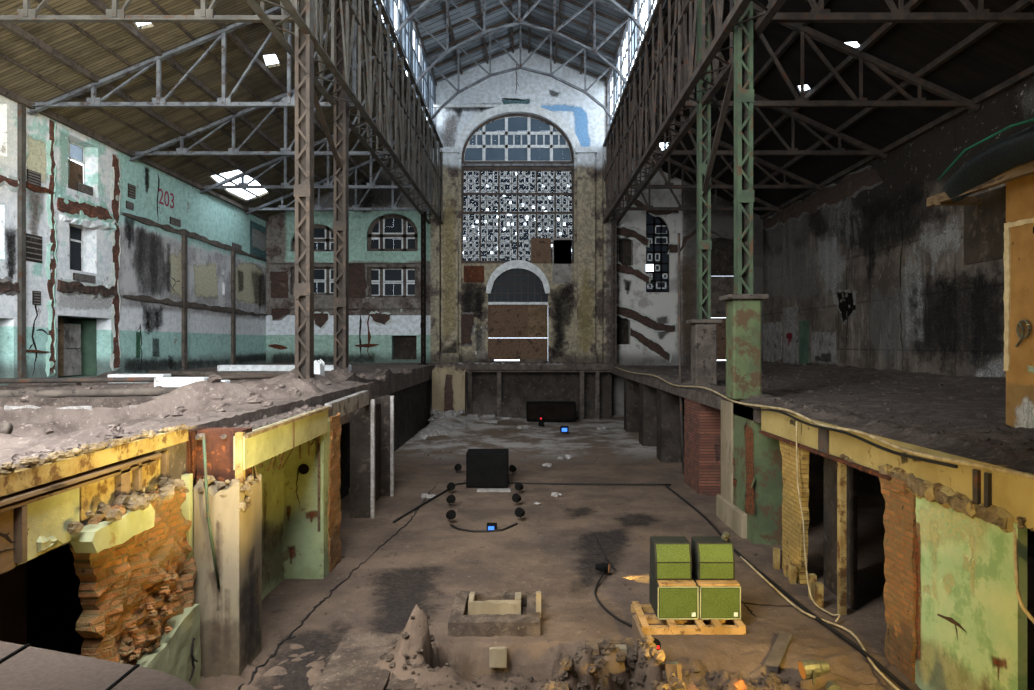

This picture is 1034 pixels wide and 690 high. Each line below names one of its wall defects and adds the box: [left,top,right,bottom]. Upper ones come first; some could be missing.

spalling [0,175,19,192]
spalling [0,269,20,296]
spalling [26,118,121,377]
damp [128,224,170,292]
damp [125,305,295,372]
damp [905,220,1004,377]
spalling [252,453,284,600]
spalling [878,463,1027,690]